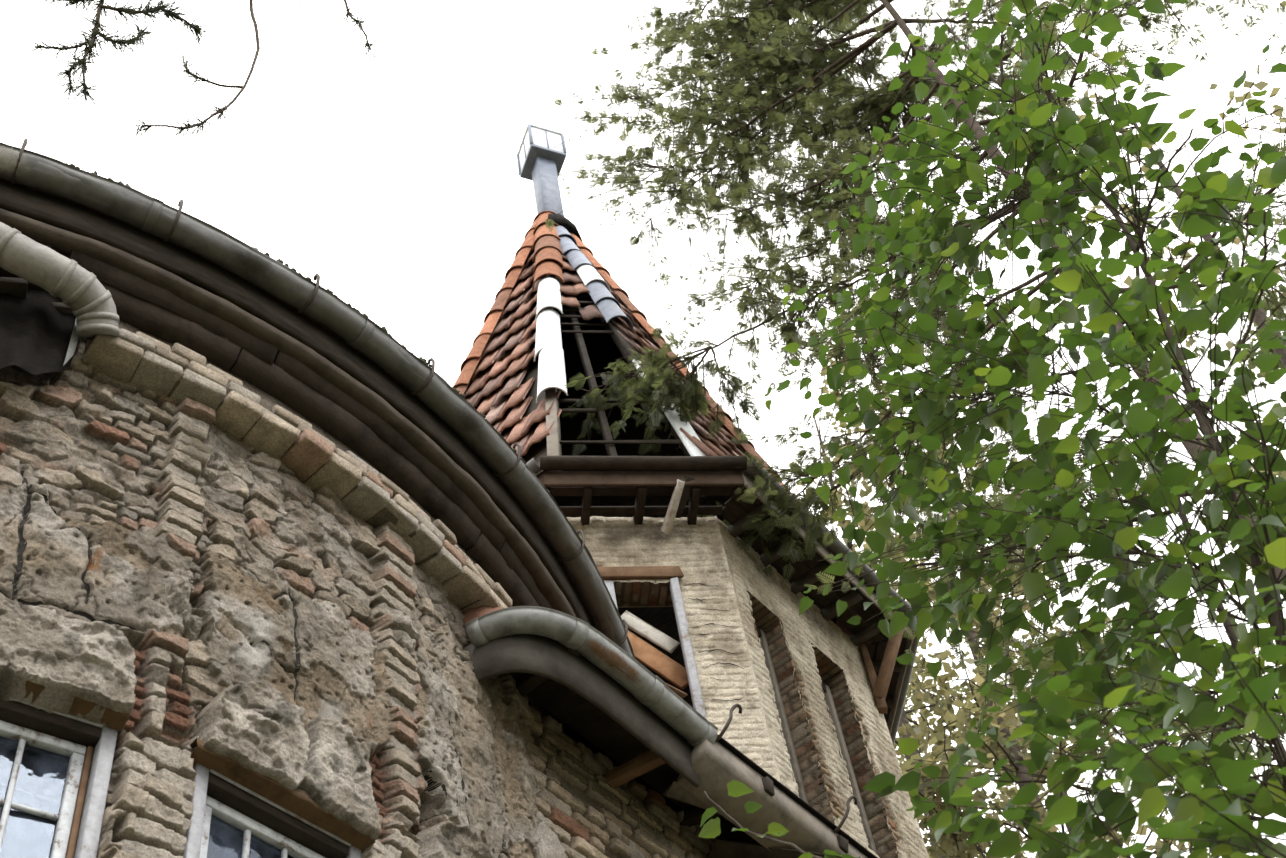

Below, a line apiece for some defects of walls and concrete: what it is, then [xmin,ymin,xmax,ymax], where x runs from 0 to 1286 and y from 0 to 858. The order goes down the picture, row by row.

spalling [0,344,177,537]
crack [0,471,146,632]
spalling [122,632,200,752]
crack [248,592,301,704]
spalling [369,740,448,849]
spalling [786,649,848,819]